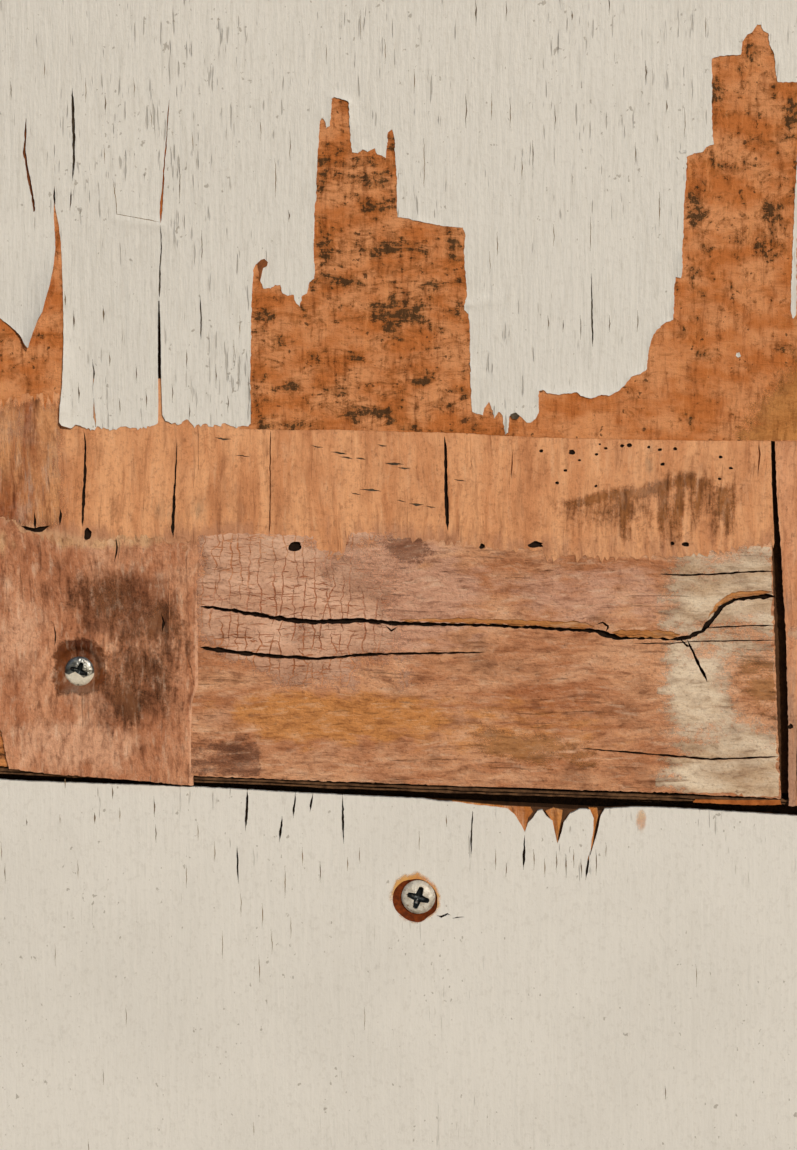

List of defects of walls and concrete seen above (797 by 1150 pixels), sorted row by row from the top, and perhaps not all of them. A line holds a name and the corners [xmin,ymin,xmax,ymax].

peeling [0,165,64,408]
peeling [240,25,797,441]
leakage [69,579,188,725]
crack [201,570,775,681]
peeling [452,800,563,843]
peeling [588,807,598,858]
rust [393,873,440,922]